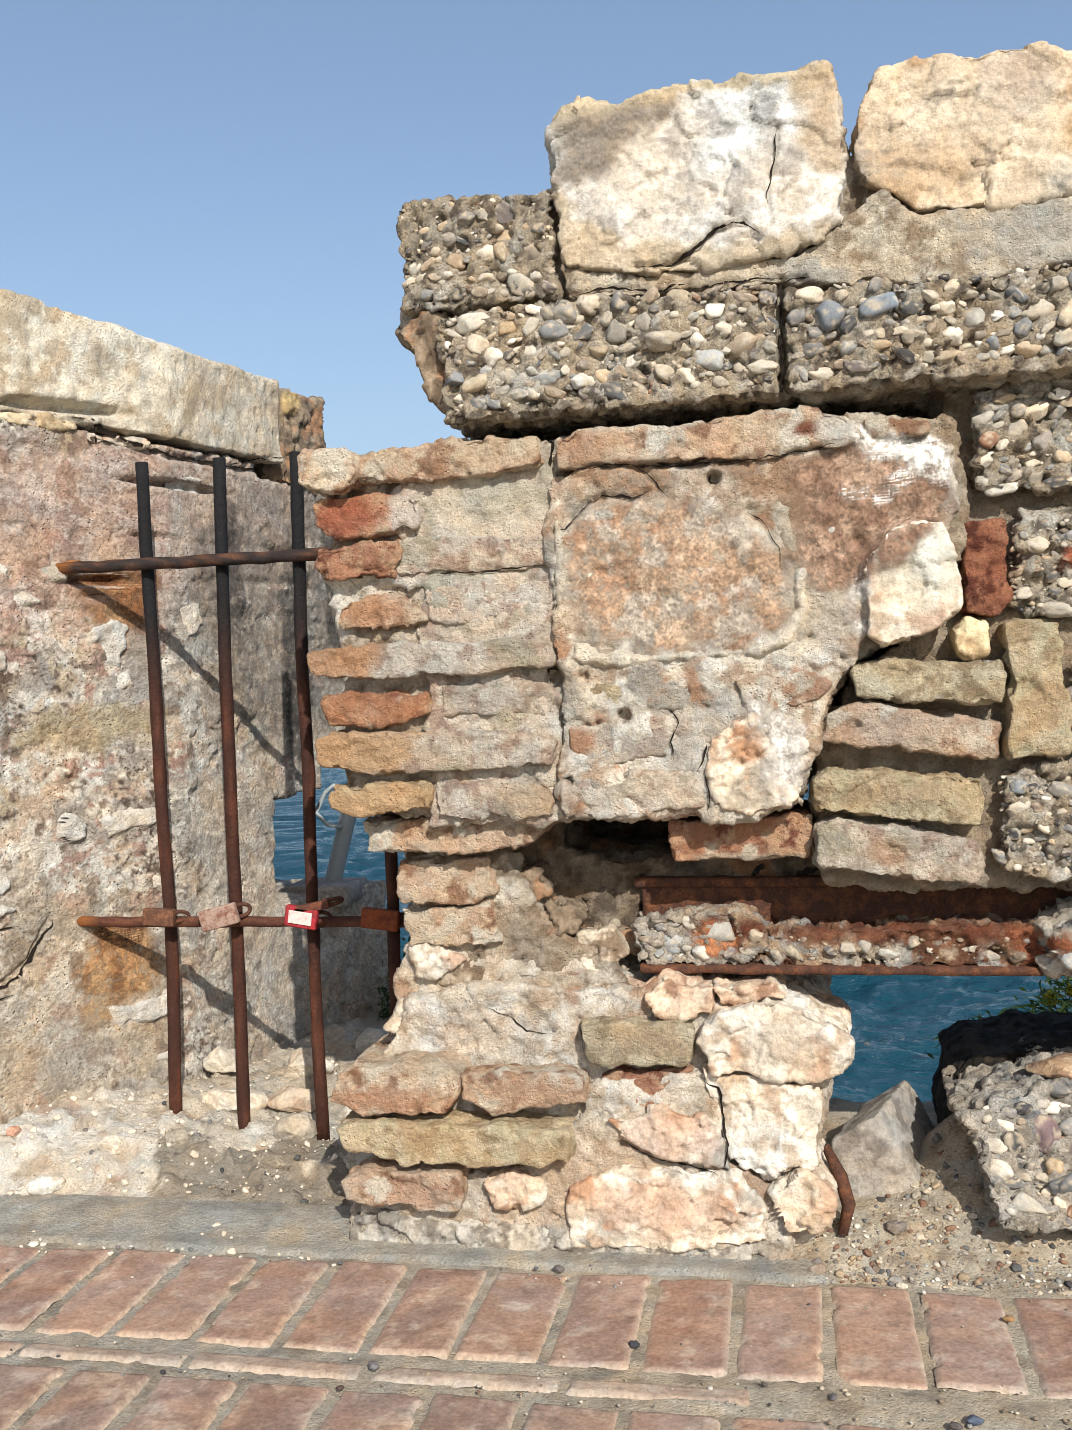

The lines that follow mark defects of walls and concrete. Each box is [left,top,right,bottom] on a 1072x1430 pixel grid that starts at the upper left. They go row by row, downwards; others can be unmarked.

crack [568,130,807,393]
corrosion [692,917,754,957]
corrosion [774,925,1072,964]